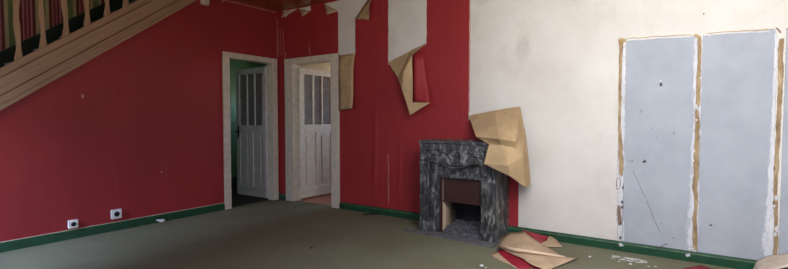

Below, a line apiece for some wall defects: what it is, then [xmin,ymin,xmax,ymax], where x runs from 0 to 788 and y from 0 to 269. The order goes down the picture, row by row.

flaking render [325,0,367,55]
flaking render [388,0,427,65]